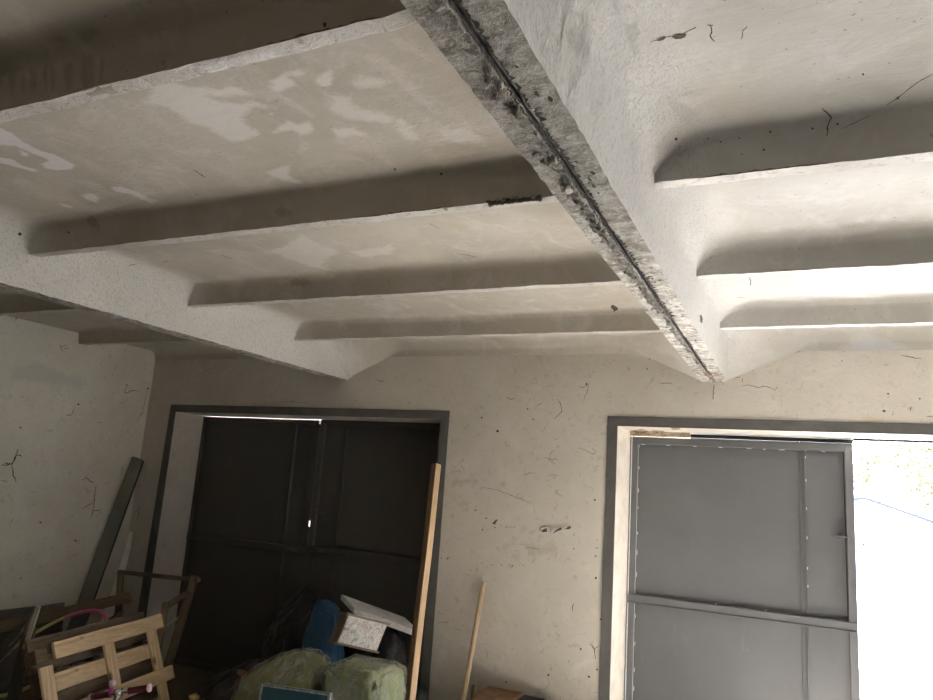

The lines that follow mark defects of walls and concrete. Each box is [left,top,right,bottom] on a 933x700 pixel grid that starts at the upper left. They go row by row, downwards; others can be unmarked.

spalling [656,33,687,41]
crack [822,74,933,136]
spalling [486,195,542,207]
crack [424,0,776,398]
crack [2,450,22,525]
spalling [539,525,572,534]